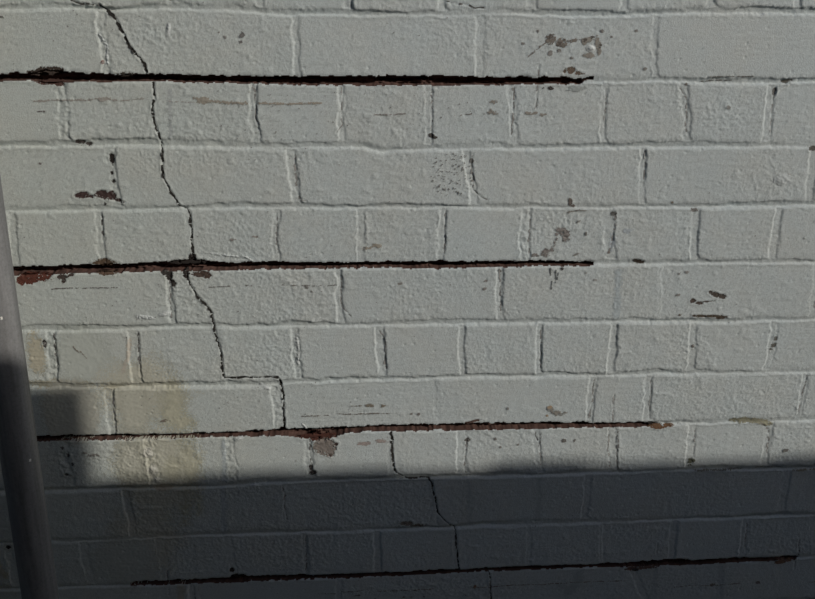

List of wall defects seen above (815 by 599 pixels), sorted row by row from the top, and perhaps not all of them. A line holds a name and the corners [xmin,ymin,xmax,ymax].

peeling [528,29,613,75]
spalling [74,153,123,205]
crack [71,0,286,427]
spalling [300,429,339,457]
crack [588,379,619,470]
crack [390,431,460,569]